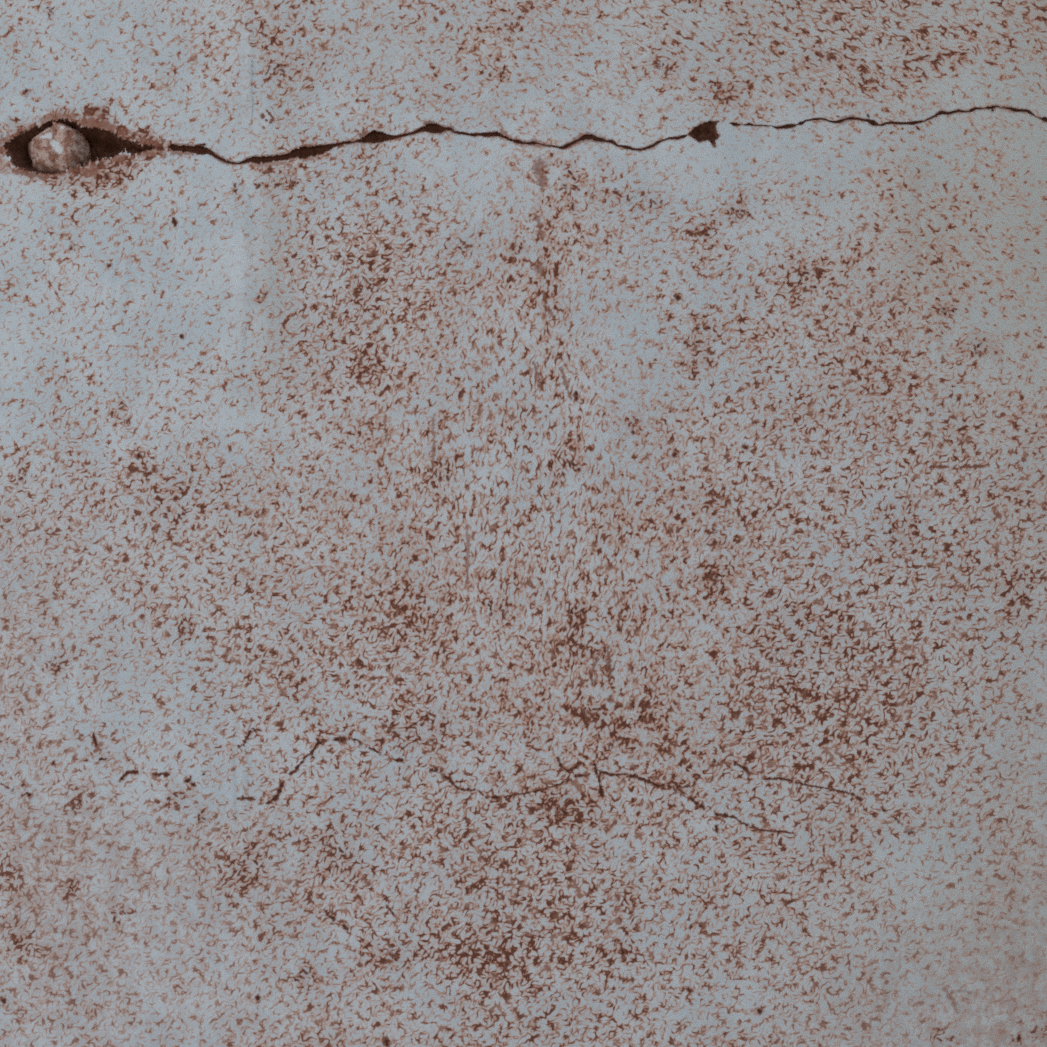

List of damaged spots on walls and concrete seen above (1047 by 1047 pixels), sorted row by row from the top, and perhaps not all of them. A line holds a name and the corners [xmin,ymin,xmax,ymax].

hole [0,93,187,202]
crack [167,119,687,170]
crack [729,103,1047,134]
corrosion [501,119,759,496]
corrosion [106,393,225,547]
corrosion [358,379,518,672]
corrosion [559,578,668,767]
crack [78,732,207,789]
corrosion [147,770,382,918]
crack [236,727,795,835]
crack [706,756,917,837]
corrosion [349,913,554,1002]